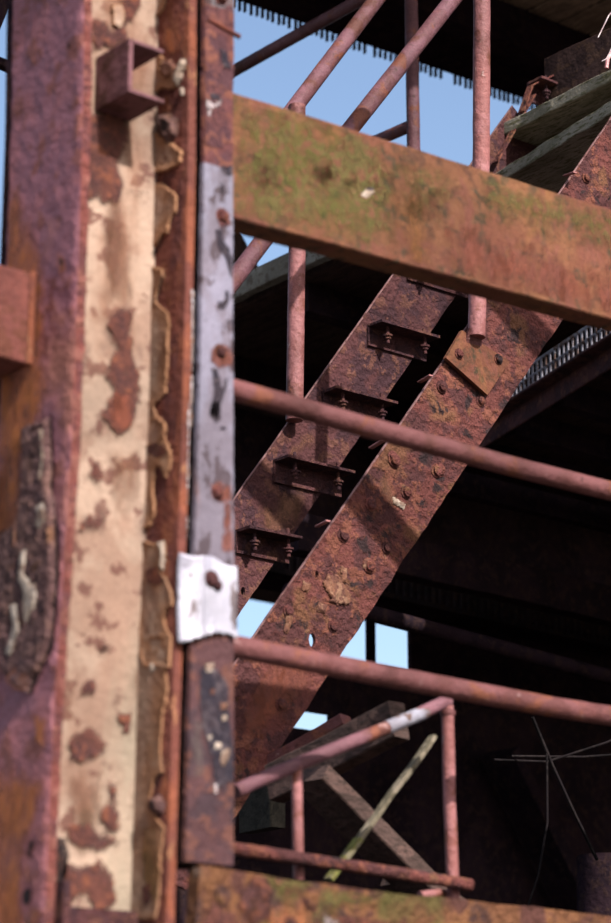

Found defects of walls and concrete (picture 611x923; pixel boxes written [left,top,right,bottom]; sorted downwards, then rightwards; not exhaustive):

peeling [155,55,186,96]
peeling [153,132,183,247]
peeling [143,266,172,529]
rust [0,197,56,693]
rust [89,460,105,482]
rust [382,479,406,510]
rust [80,514,102,530]
rust [317,566,352,613]
rust [82,679,96,694]
rust [69,727,108,762]
peeling [130,541,173,921]
rust [62,780,121,909]